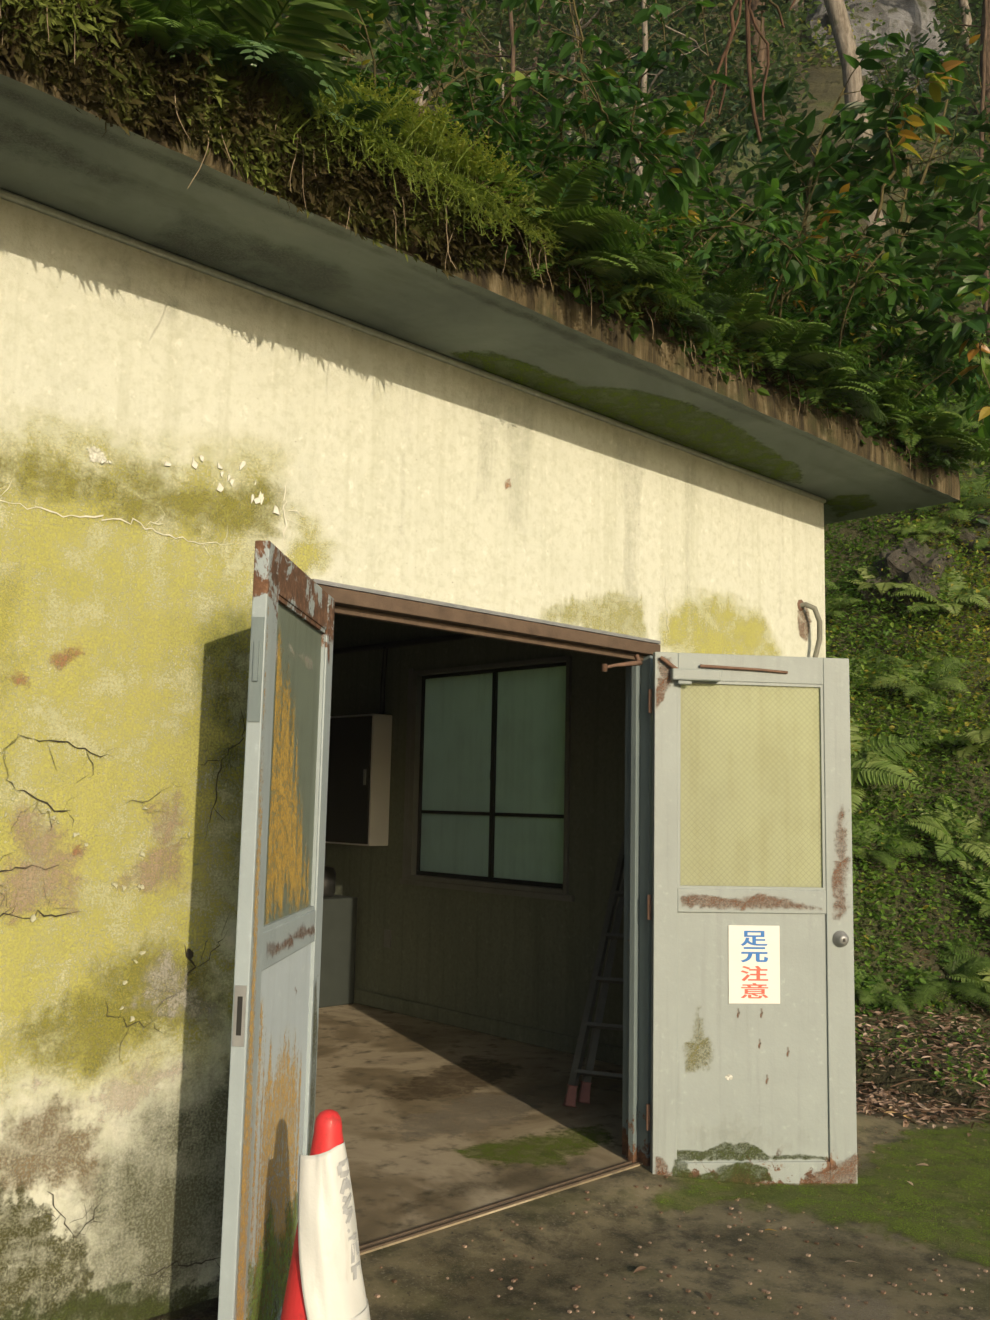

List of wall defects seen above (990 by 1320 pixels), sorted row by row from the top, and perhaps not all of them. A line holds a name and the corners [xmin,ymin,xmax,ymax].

spalling [86,446,112,464]
spalling [191,455,246,492]
spalling [251,480,279,515]
crack [0,481,231,555]
corrosion [798,608,811,640]
crack [127,706,245,848]
crack [0,734,117,919]
corrosion [832,811,848,918]
corrosion [681,894,806,910]
damp [0,1063,230,1301]
corrosion [738,1155,858,1185]